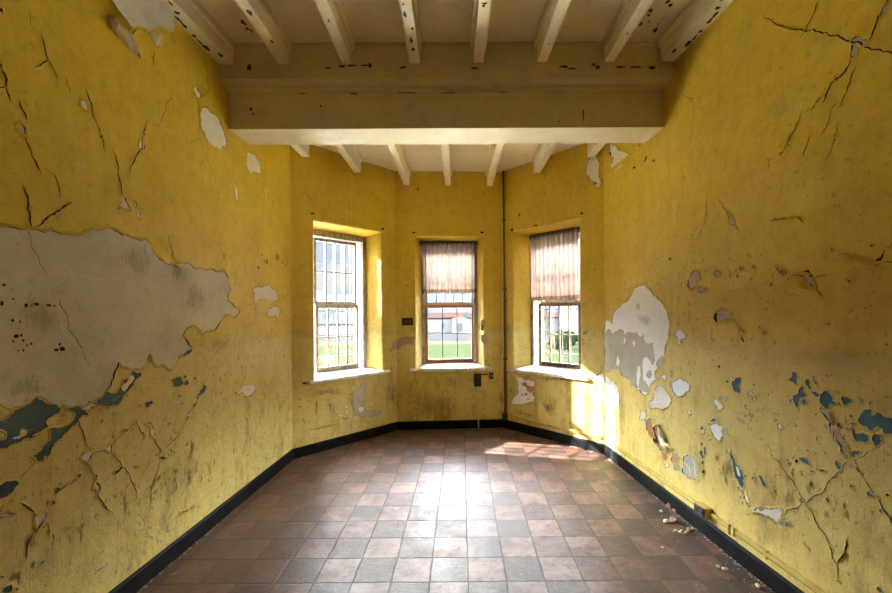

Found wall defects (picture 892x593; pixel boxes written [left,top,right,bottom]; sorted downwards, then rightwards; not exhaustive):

crack [0,61,13,104]
crack [23,170,73,228]
crack [29,12,72,95]
crack [113,97,172,213]
peeling [108,0,227,201]
peeling [585,143,656,190]
crack [761,0,892,168]
spalling [0,222,286,557]
peeling [510,374,536,406]
peeling [604,283,794,529]
peeling [787,370,892,526]
crack [768,452,847,584]